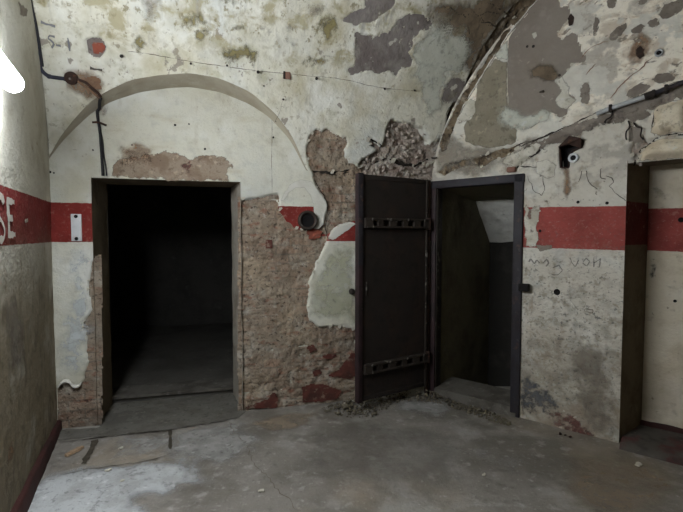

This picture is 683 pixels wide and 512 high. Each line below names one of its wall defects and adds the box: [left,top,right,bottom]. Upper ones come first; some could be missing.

spalling [112,148,233,182]
spalling [237,0,683,411]
crack [515,112,596,195]
spalling [57,254,103,428]
water stain [520,378,556,412]
water stain [575,346,607,418]